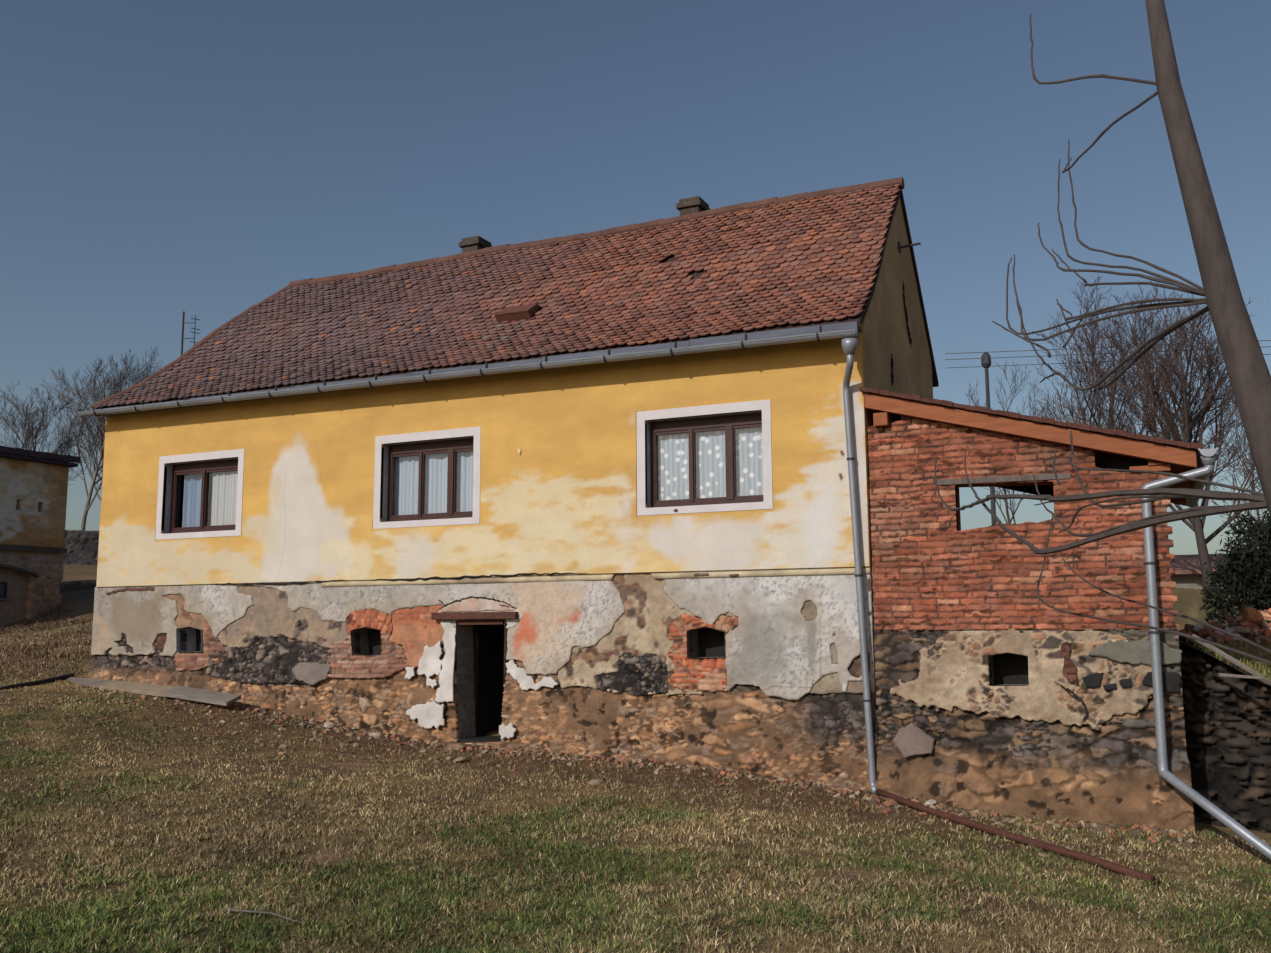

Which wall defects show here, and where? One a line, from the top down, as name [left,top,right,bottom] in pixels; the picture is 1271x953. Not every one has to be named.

peeling [0,469,58,542]
peeling [96,375,871,729]
peeling [890,630,1180,731]
peeling [499,723,516,740]